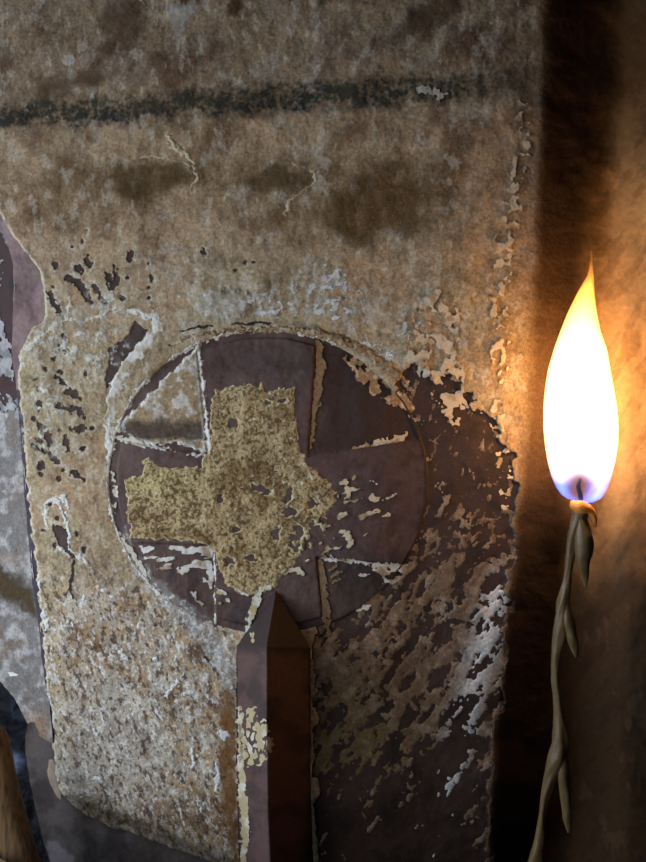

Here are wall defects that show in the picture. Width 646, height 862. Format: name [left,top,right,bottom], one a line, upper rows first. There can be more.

peeling [416,85,449,101]
spalling [64,254,130,306]
peeling [105,321,148,388]
peeling [0,215,95,684]
peeling [112,435,144,451]
peeling [281,100,532,862]
peeling [119,536,272,643]
peeling [163,671,196,698]
peeling [25,722,211,862]
peeling [213,762,221,792]
peeling [219,706,275,862]